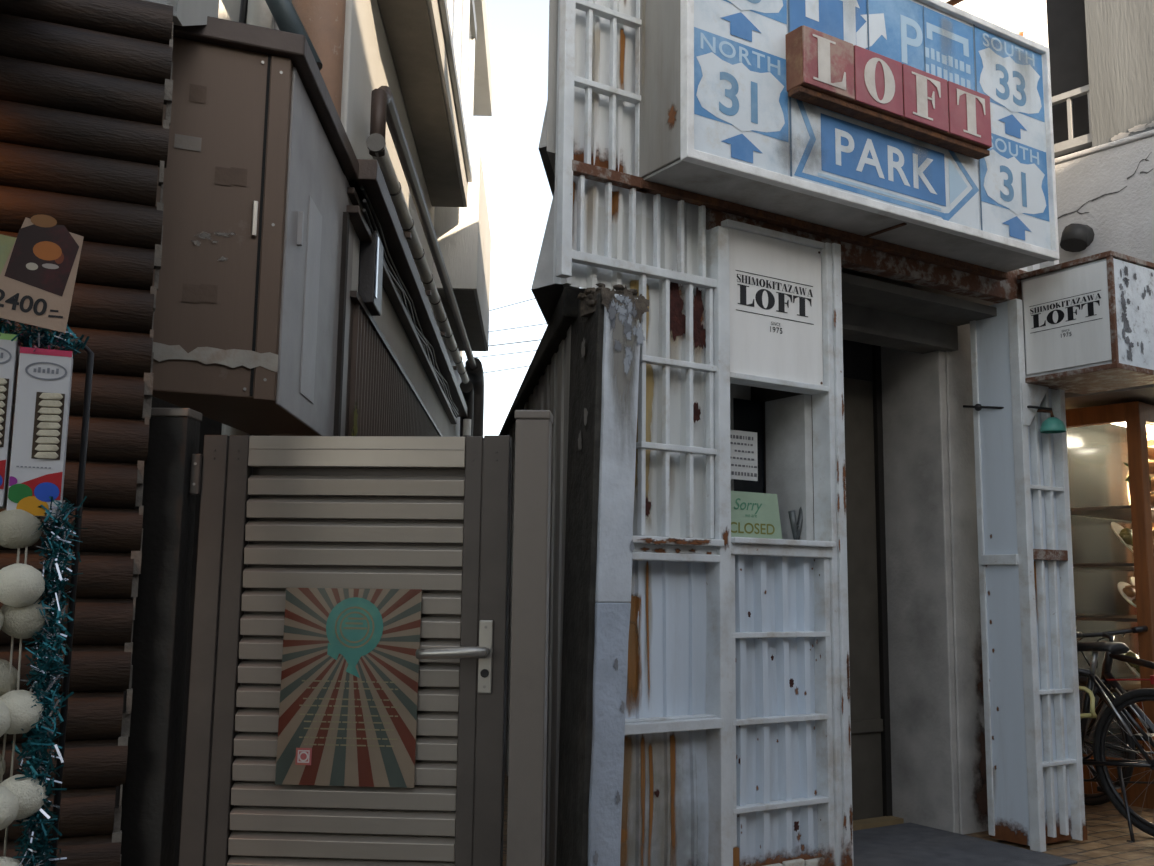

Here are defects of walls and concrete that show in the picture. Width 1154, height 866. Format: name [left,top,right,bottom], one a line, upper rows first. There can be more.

crack [1057,152,1154,219]
peeling [577,283,649,375]
rust [837,459,846,512]
rust [626,528,729,703]
rust [841,655,851,746]
rust [620,735,653,866]
rust [733,808,853,866]